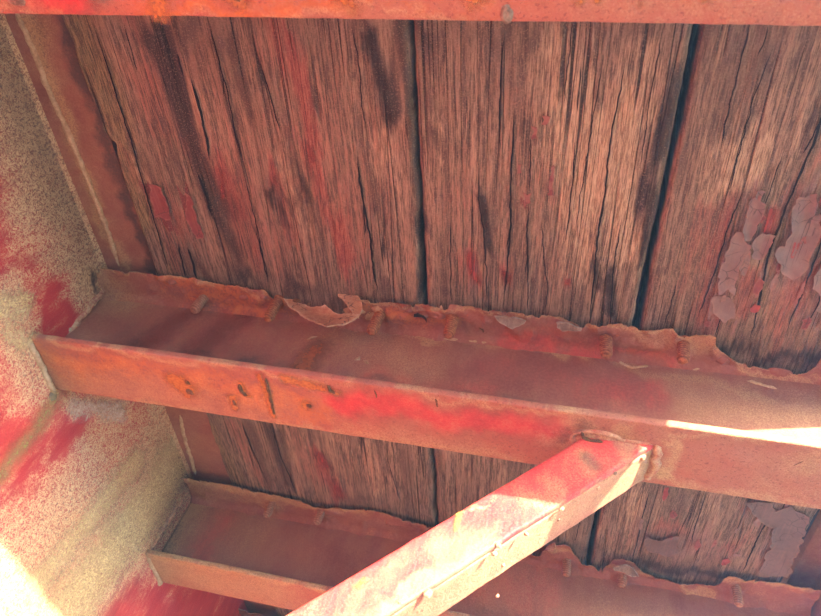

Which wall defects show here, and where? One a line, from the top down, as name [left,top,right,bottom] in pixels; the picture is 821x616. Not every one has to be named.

crack [352,29,366,128]
crack [639,35,662,167]
crack [357,157,379,294]
crack [446,227,454,300]
crack [478,36,549,315]
crack [564,22,625,322]
peeling [708,190,821,337]
crack [749,118,821,340]
rust [229,382,251,411]
rust [256,373,276,418]
rust [280,340,340,396]
peeling [746,502,810,578]